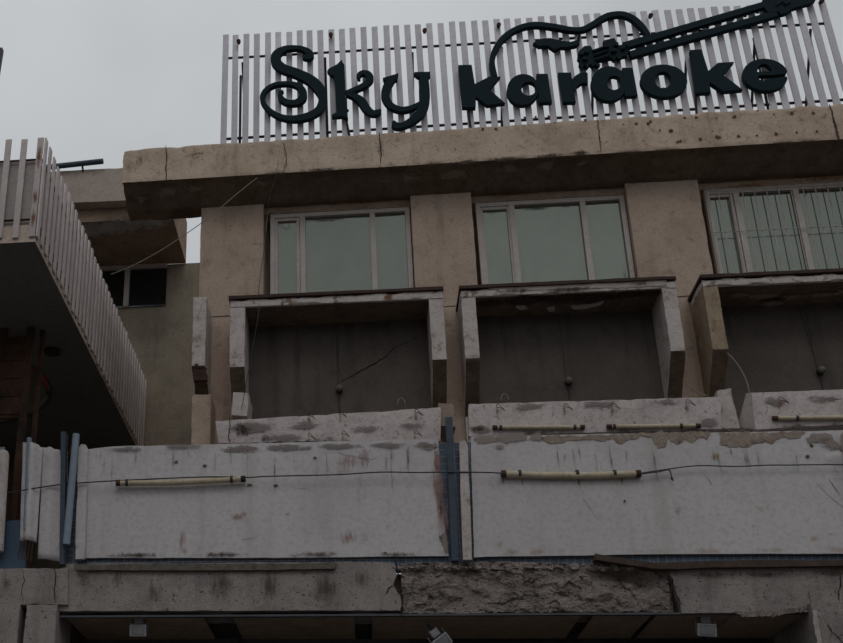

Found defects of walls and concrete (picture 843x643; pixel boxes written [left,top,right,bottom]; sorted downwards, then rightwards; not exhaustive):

spalling [476,280,667,312]
peeling [470,418,841,451]
crack [386,560,419,615]
spalling [401,530,673,614]